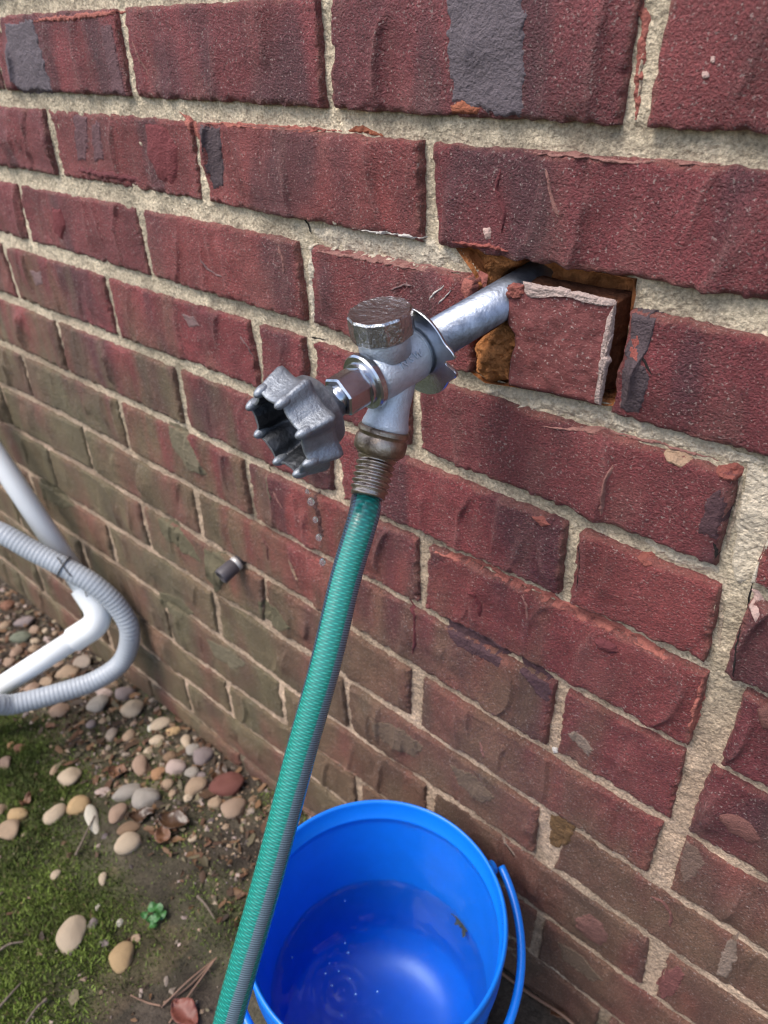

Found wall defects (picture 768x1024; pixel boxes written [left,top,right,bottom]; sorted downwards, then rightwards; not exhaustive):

spalling [475,320,515,382]
spalling [630,336,639,361]